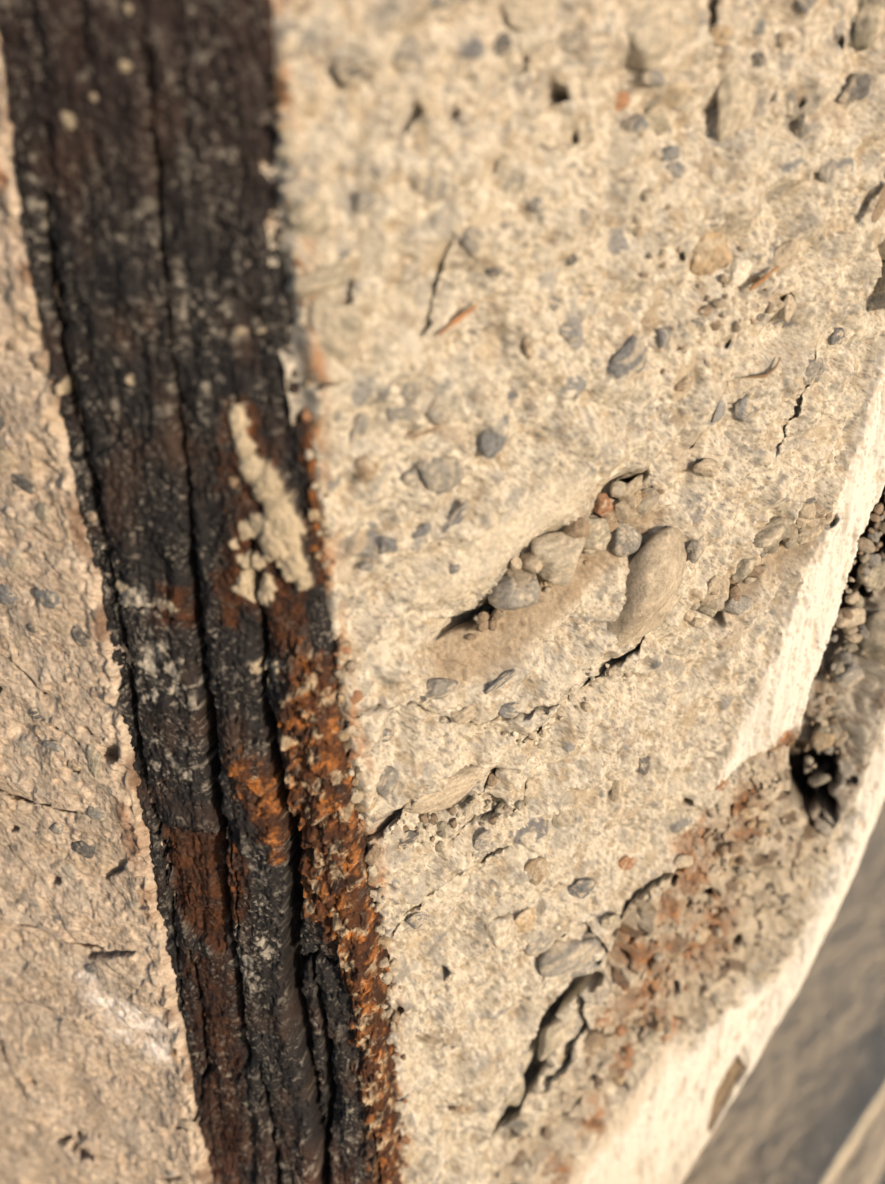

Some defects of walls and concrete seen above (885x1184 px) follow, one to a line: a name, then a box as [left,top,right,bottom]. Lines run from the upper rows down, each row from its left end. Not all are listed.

corrosion [0,161,13,194]
spalling [0,31,213,1184]
spalling [260,0,885,1184]
corrosion [155,396,402,1184]
corrosion [768,726,801,760]
corrosion [113,800,159,921]
corrosion [611,788,767,1044]
corrosion [537,1150,576,1184]
corrosion [579,1089,611,1142]
corrosion [609,1041,635,1077]